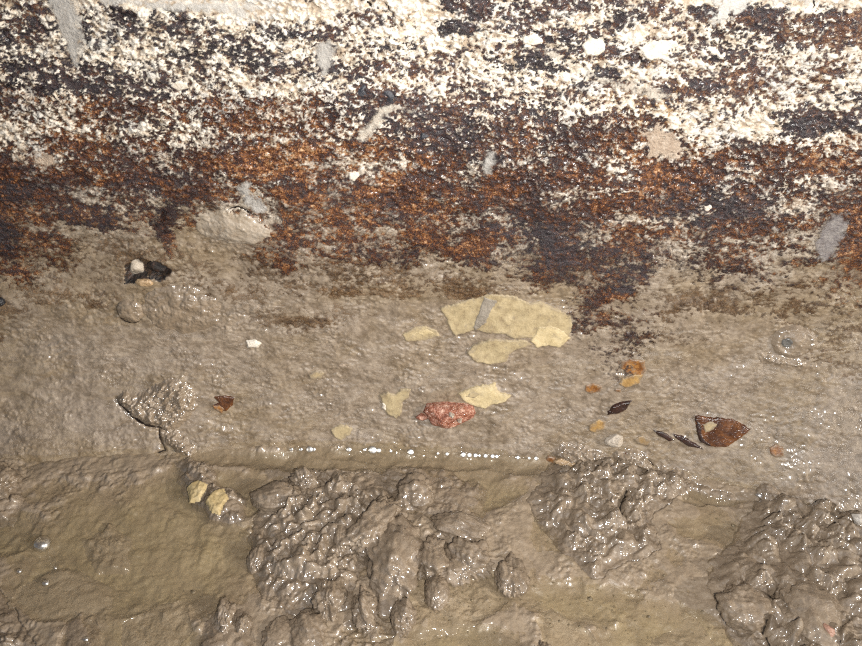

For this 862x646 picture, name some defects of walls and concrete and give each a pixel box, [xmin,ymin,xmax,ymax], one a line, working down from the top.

rust [0,77,862,432]